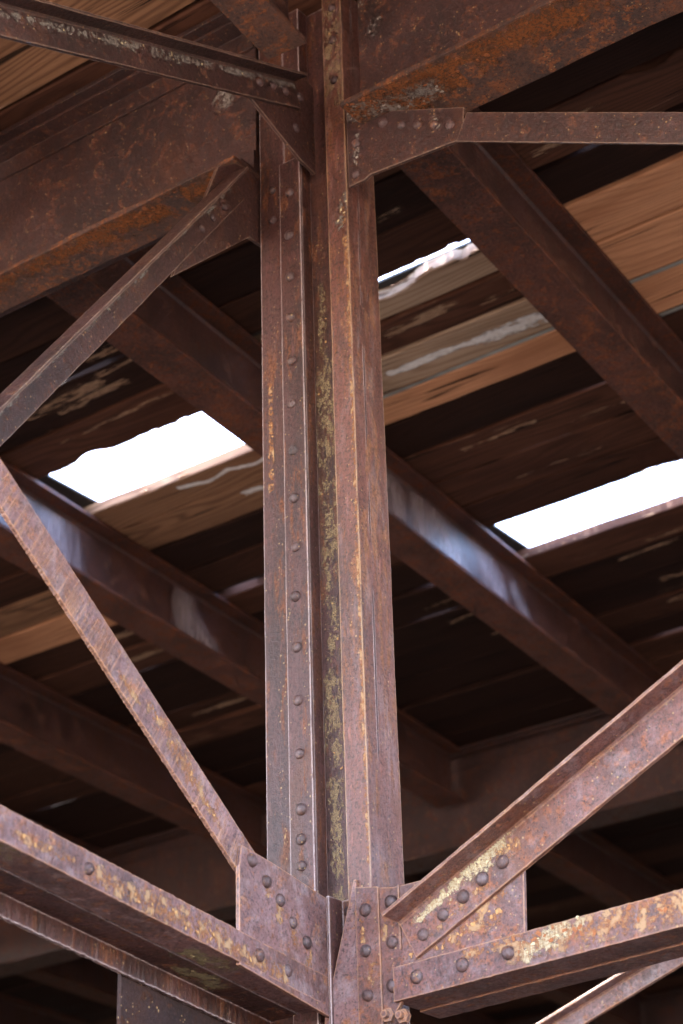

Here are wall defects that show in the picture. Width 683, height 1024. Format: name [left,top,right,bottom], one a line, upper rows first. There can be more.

rust [0,171,214,291]